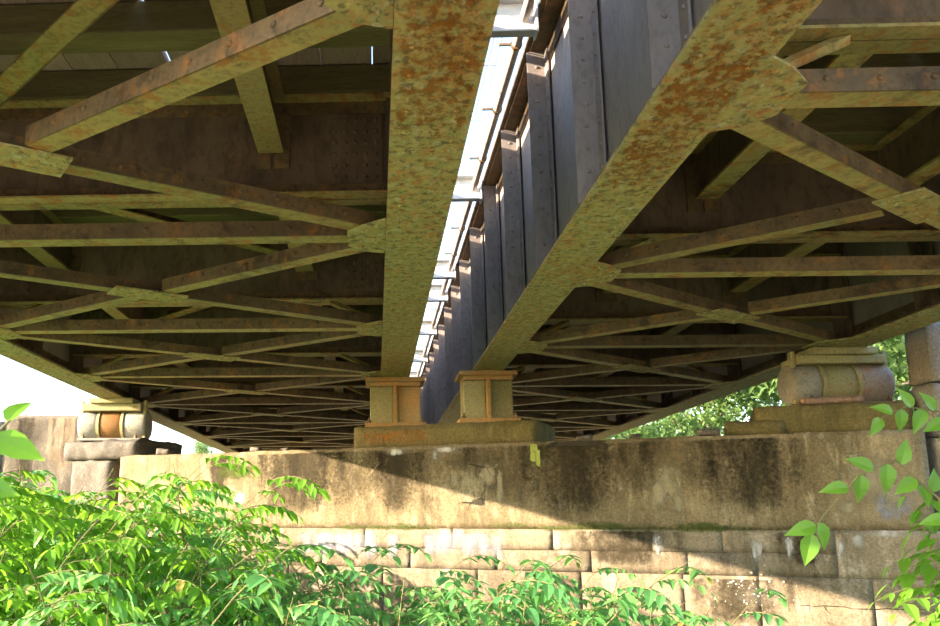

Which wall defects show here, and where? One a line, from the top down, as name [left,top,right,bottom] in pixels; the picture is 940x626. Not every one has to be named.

corrosion [396,0,490,138]
corrosion [593,0,802,199]
water stain [268,443,646,510]
water stain [685,438,779,509]
water stain [712,579,773,620]
crack [787,605,926,614]